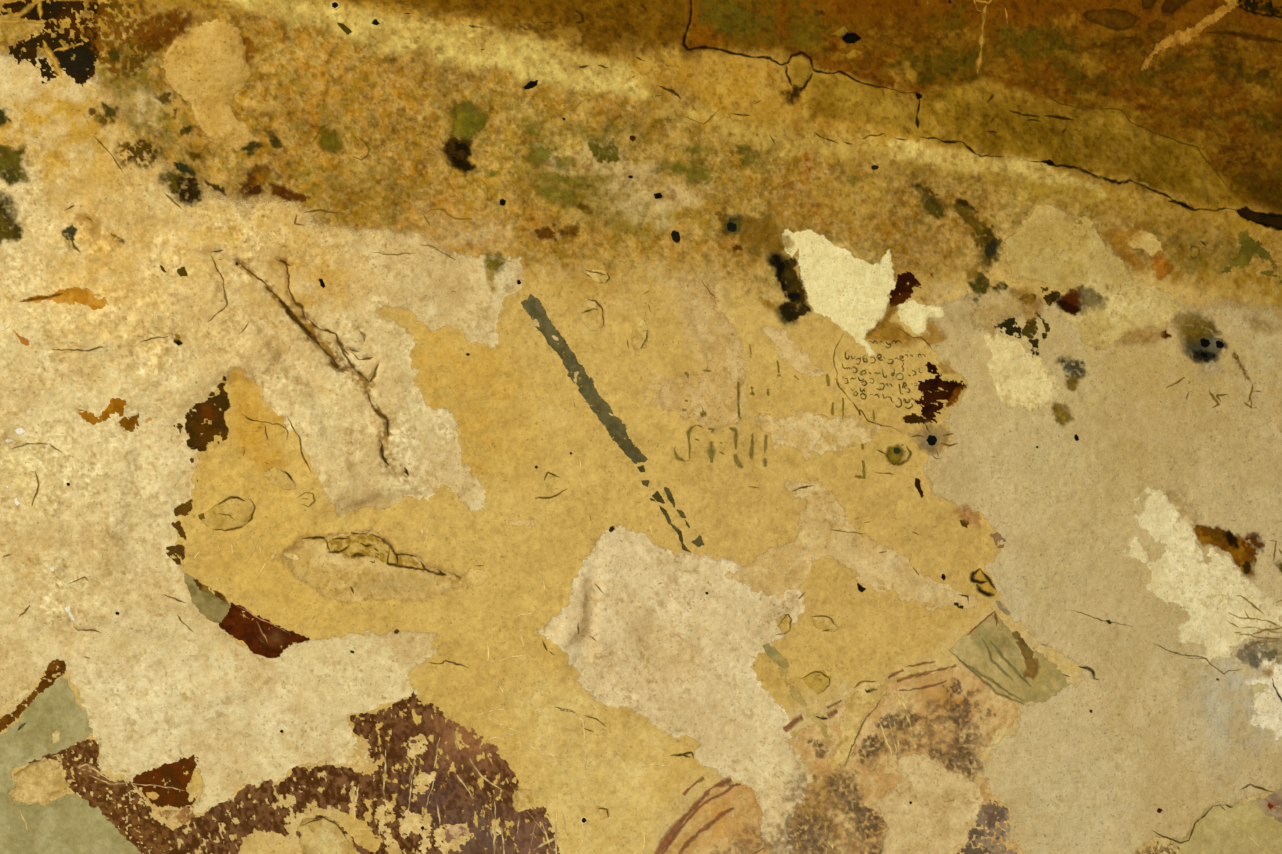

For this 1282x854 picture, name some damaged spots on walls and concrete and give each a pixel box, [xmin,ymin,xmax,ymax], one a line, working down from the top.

leakage [1237,0,1282,18]
leakage [588,142,619,163]
crack [579,57,775,144]
leakage [783,85,802,104]
crack [683,0,1282,230]
mould [723,216,810,324]
peeling [1221,231,1282,284]
crack [208,250,409,481]
crack [243,415,315,507]
flaking render [0,0,571,854]
flaking render [537,269,1282,854]
rust [1166,493,1264,577]